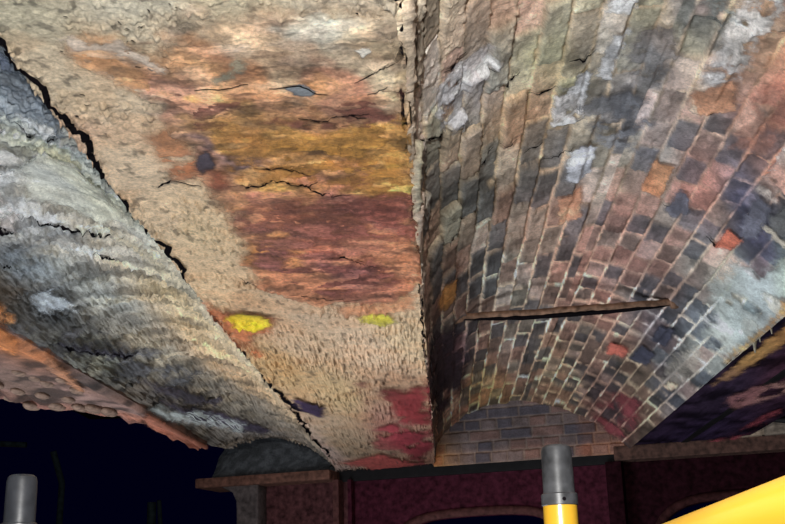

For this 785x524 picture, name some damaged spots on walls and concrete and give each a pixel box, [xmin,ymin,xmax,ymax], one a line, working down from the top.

water stain [607,0,639,15]
corrosion [149,132,200,181]
spalling [61,9,422,308]
crack [229,168,349,197]
crack [298,114,368,123]
crack [355,0,456,156]
water stain [435,44,501,132]
water stain [551,30,627,127]
water stain [690,0,784,116]
crack [0,37,330,457]
crack [416,245,433,440]